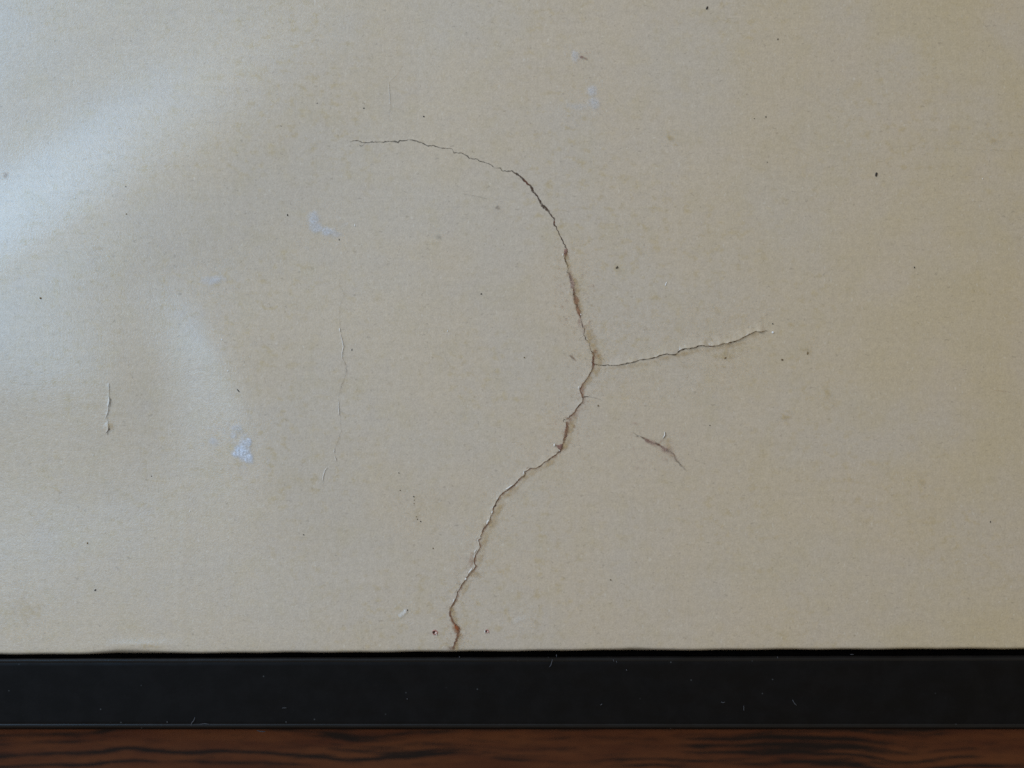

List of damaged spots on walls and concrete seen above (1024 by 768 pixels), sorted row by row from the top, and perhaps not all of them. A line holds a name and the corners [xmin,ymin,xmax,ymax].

crack [353,136,766,648]